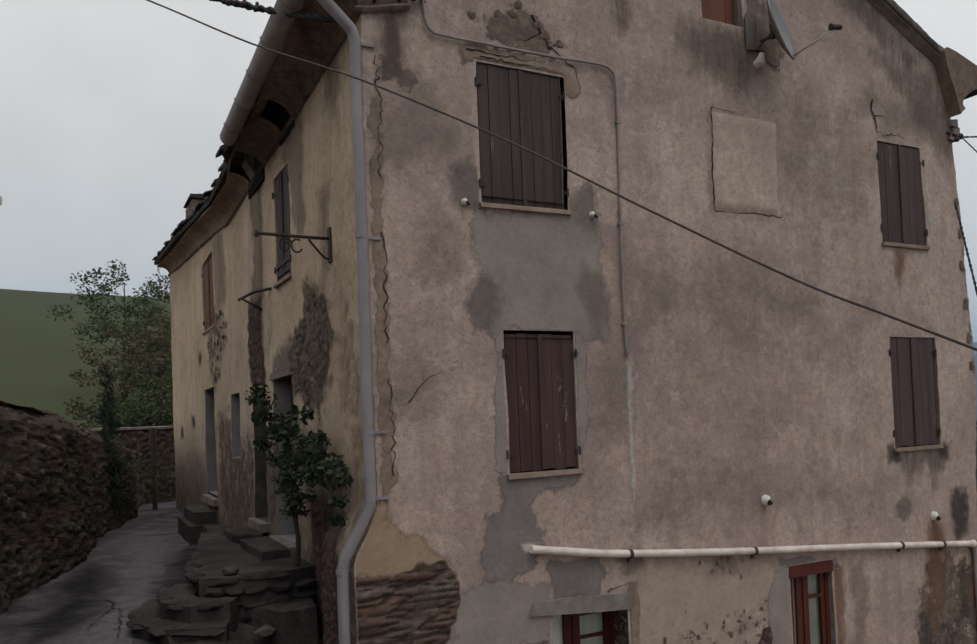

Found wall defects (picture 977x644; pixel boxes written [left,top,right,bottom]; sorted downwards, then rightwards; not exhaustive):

flaking render [459,0,580,98]
crack [871,99,907,141]
flaking render [207,308,227,391]
flaking render [288,278,337,419]
crack [407,368,458,403]
flaking render [356,560,461,644]
flaking render [627,556,779,644]
flaking render [913,552,977,644]